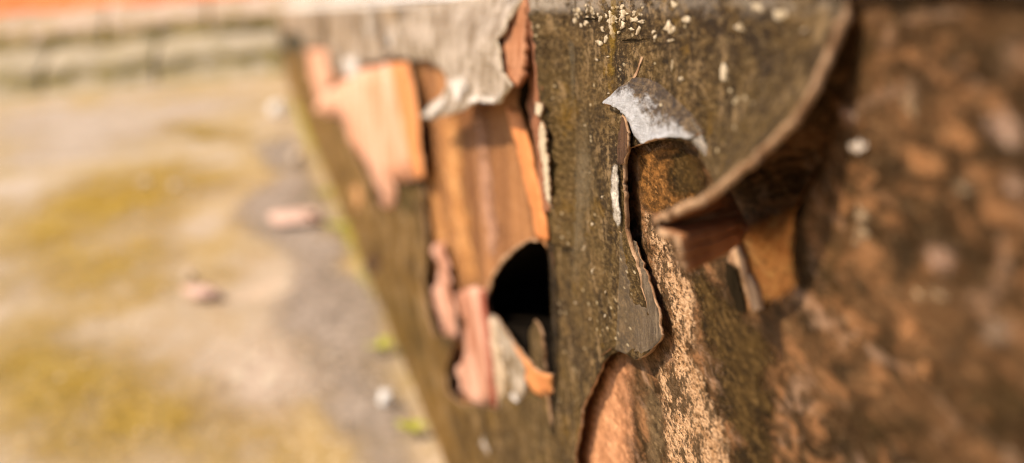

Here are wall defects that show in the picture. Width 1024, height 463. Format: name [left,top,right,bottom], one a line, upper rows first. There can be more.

spalling [307,0,690,411]
spalling [564,0,1024,463]